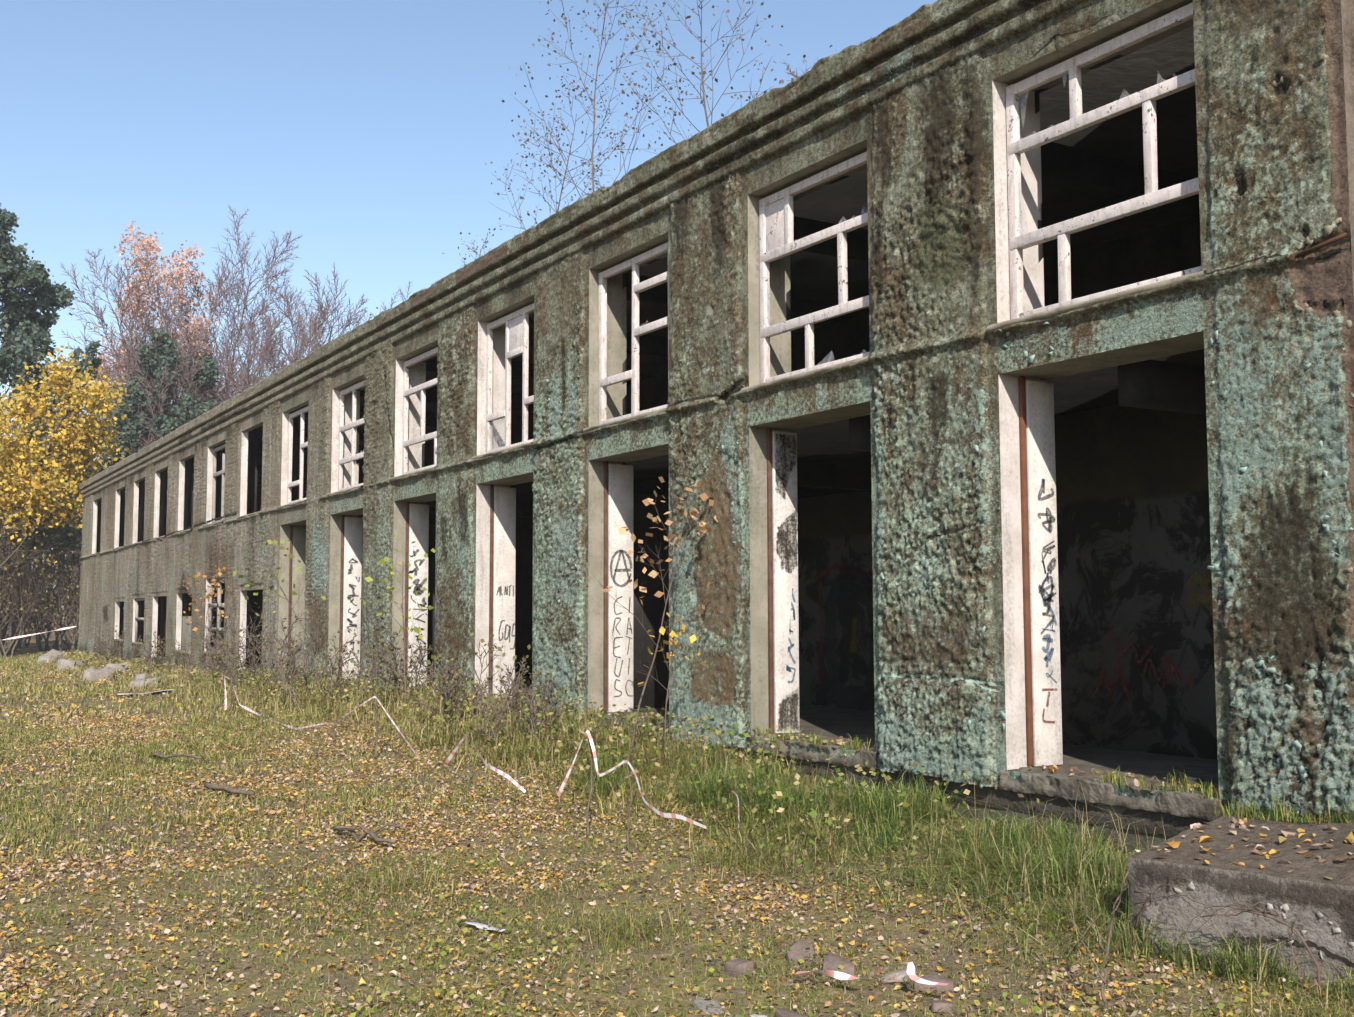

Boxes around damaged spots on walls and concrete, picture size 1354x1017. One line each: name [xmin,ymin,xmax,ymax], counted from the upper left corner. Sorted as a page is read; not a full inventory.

water stain [873,18,991,299]
spalling [670,375,749,746]
water stain [1232,473,1340,702]